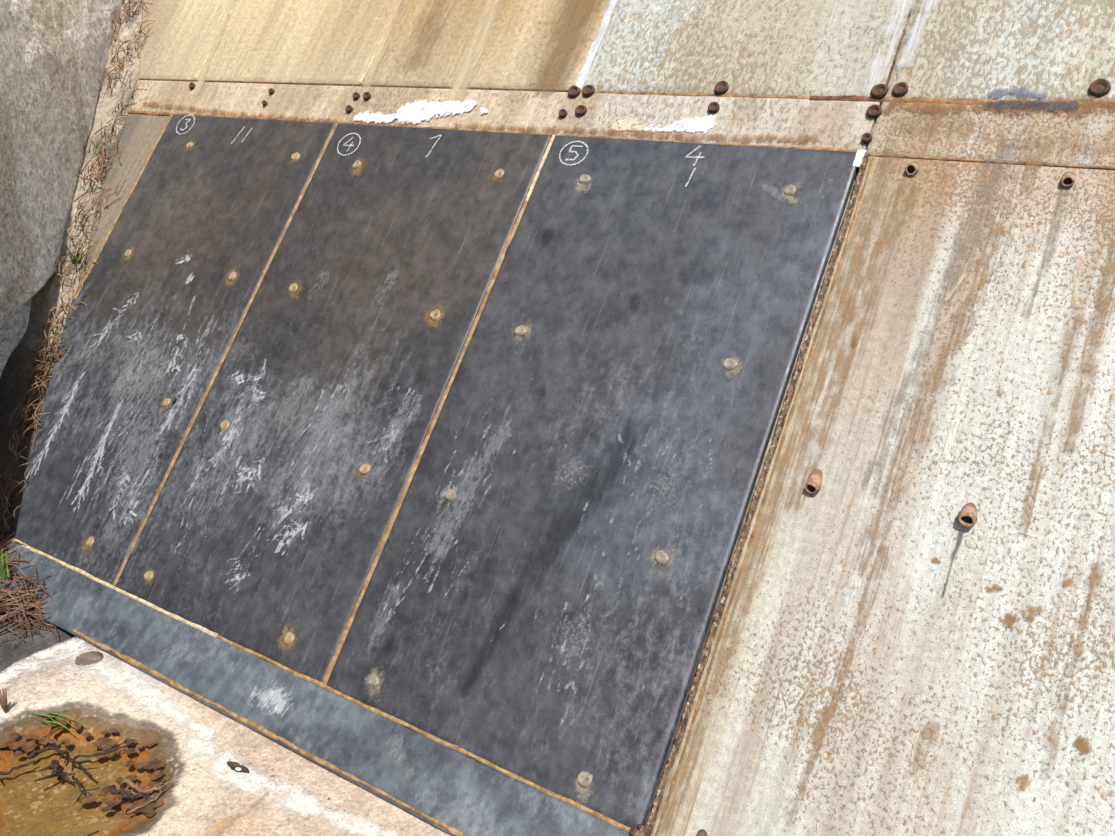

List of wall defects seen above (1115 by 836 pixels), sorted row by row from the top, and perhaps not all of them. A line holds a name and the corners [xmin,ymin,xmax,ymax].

rust [884,95,1115,135]
rust [900,212,1010,451]
rust [1065,243,1115,452]
rust [693,154,914,707]
rust [1023,459,1043,531]
rust [1003,605,1042,627]
rust [1066,566,1102,669]
damp [0,637,397,836]
rust [661,725,701,834]
rust [813,638,855,747]
rust [1073,735,1090,755]